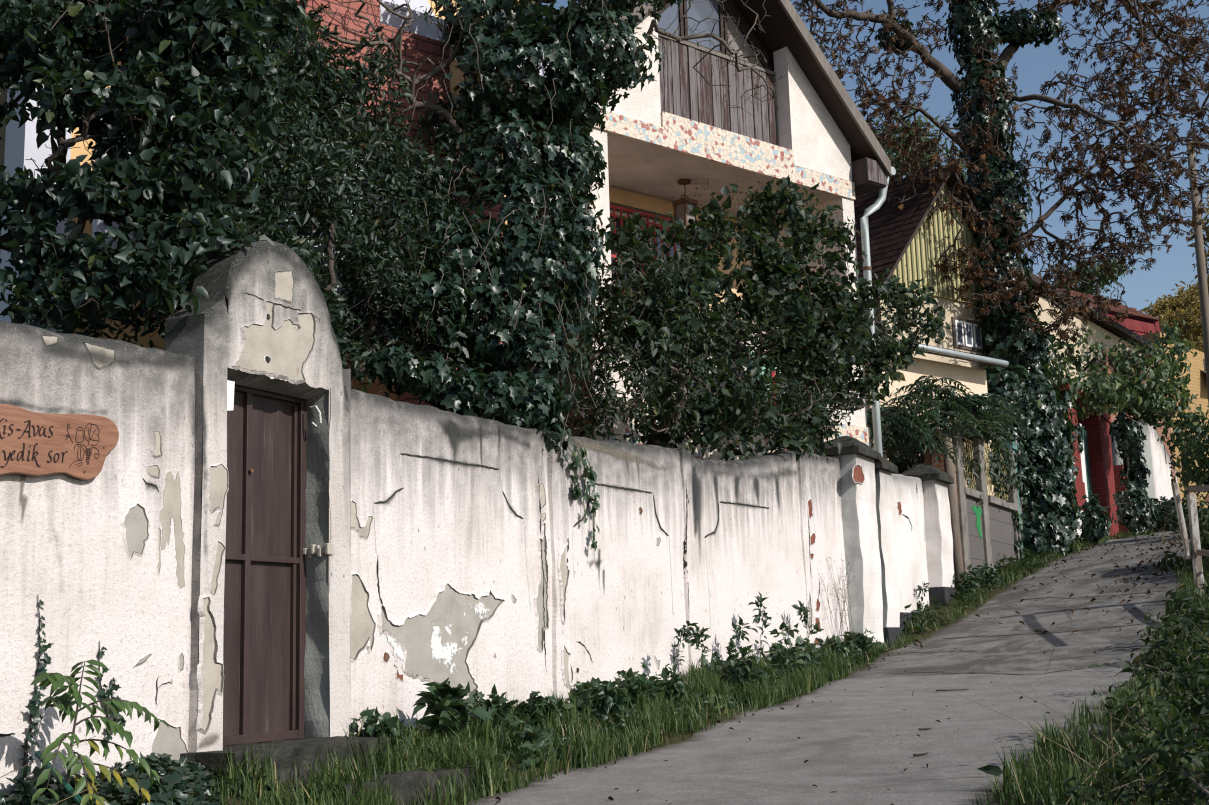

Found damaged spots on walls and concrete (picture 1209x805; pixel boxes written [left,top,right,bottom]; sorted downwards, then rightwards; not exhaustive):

flaking render [231,269,316,385]
peeling [121,430,187,592]
flaking render [150,462,229,764]
flaking render [351,499,373,540]
flaking render [351,571,517,696]
water stain [444,421,530,468]
flaking render [533,482,570,653]
water stain [693,467,721,538]